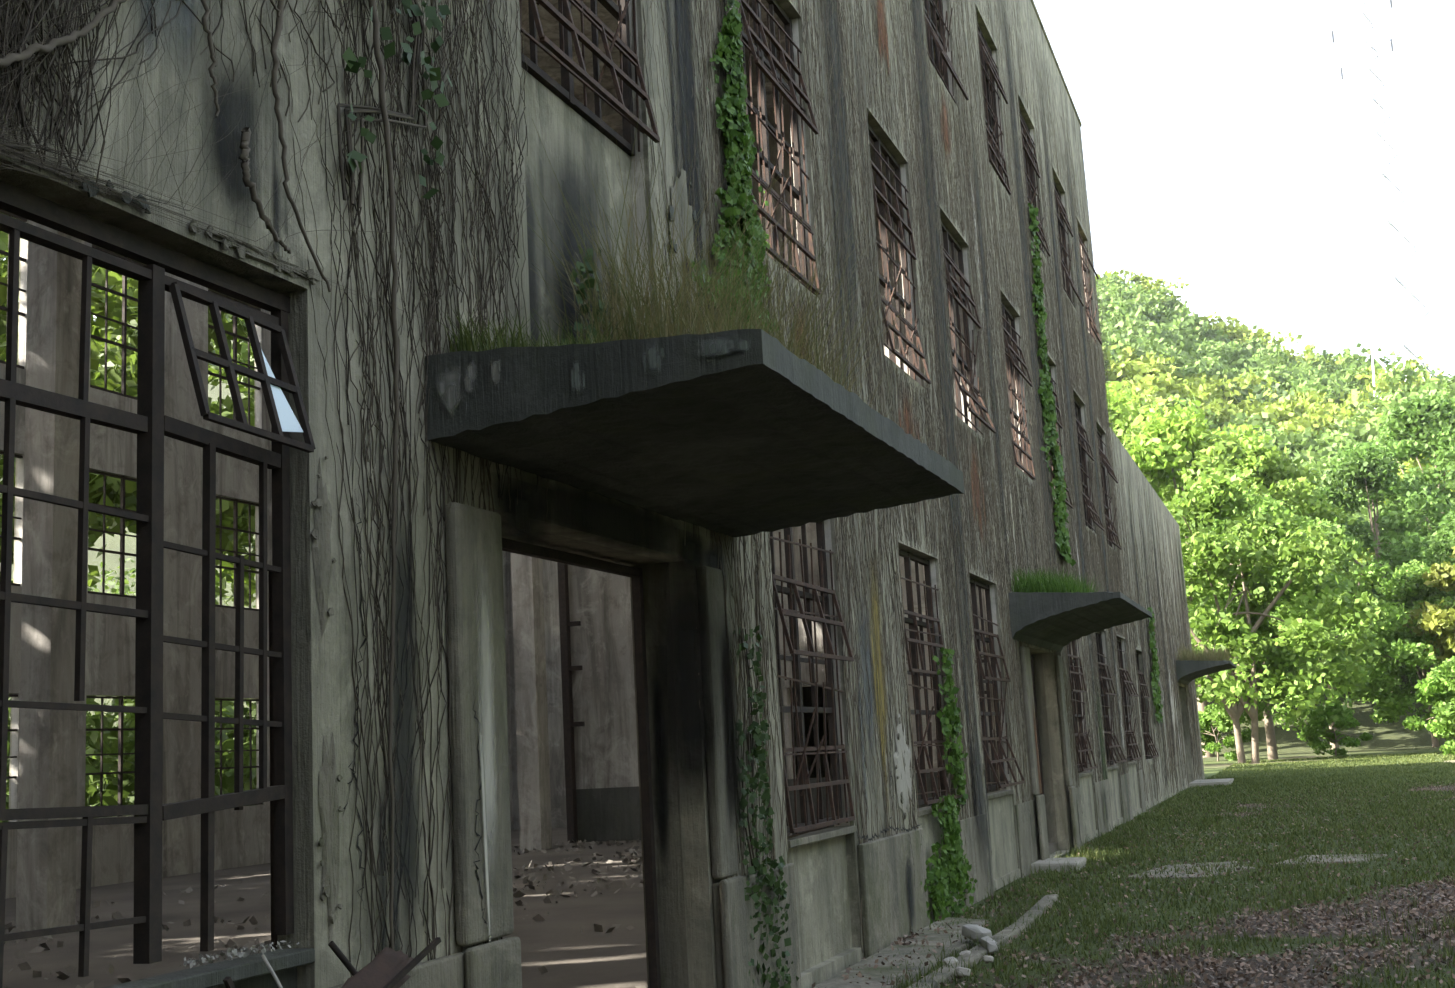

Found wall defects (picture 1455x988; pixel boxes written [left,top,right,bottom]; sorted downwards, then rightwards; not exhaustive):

corrosion [877,0,889,70]
water stain [654,677,667,855]